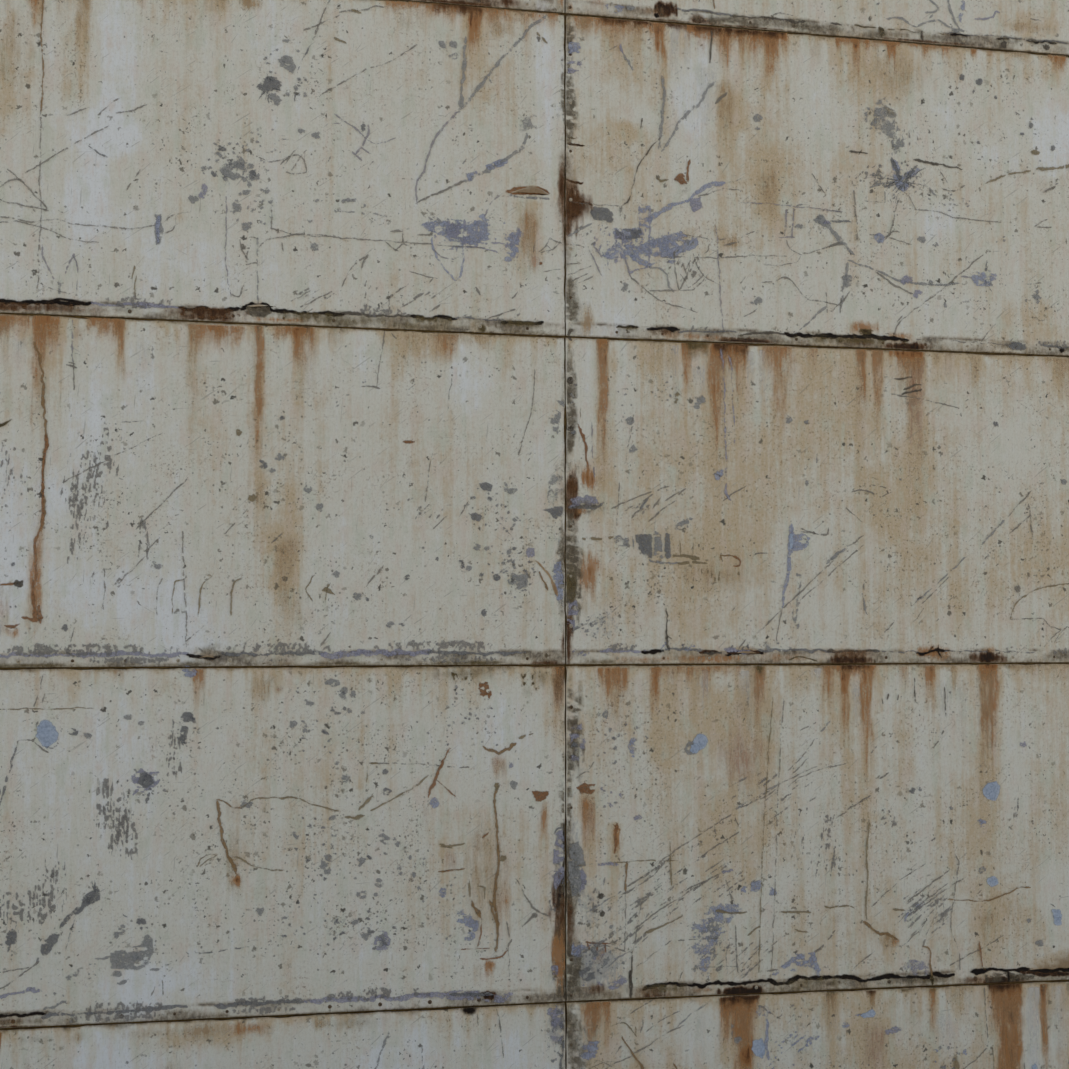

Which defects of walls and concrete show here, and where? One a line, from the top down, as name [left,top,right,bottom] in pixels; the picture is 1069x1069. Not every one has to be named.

rust [507,171,593,239]
rust [681,335,787,438]
rust [532,362,611,1066]
rust [825,652,876,738]
rust [707,985,763,1068]
rust [967,976,1024,1069]